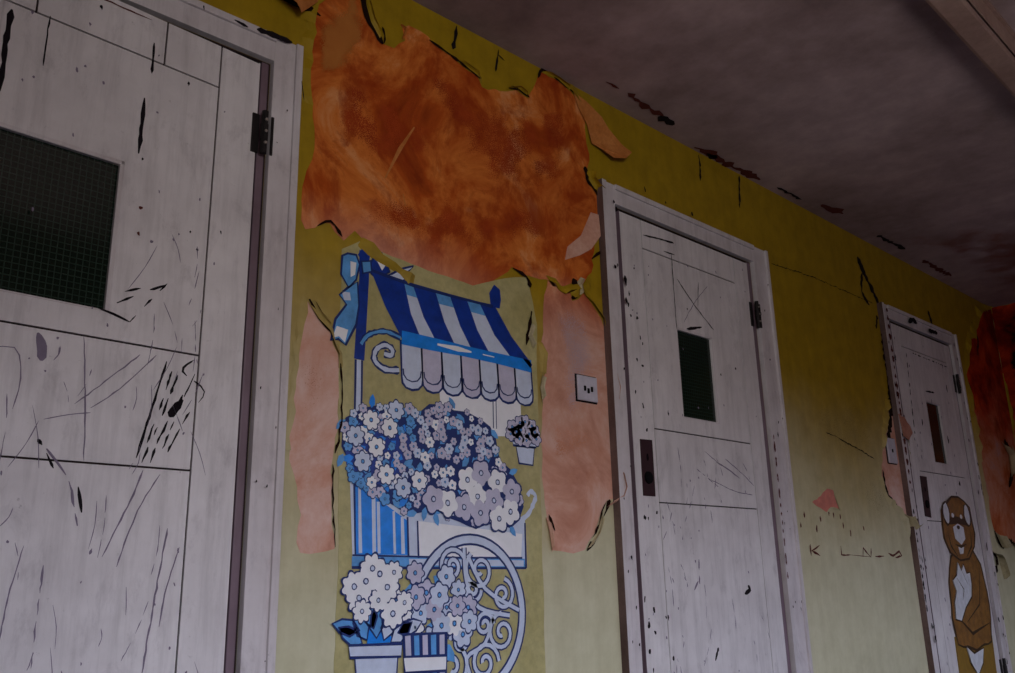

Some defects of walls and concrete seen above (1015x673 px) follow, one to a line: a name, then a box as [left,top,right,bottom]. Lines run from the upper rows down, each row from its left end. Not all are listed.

flaking render [235,0,632,554]
flaking render [879,308,923,542]
flaking render [954,303,1015,586]